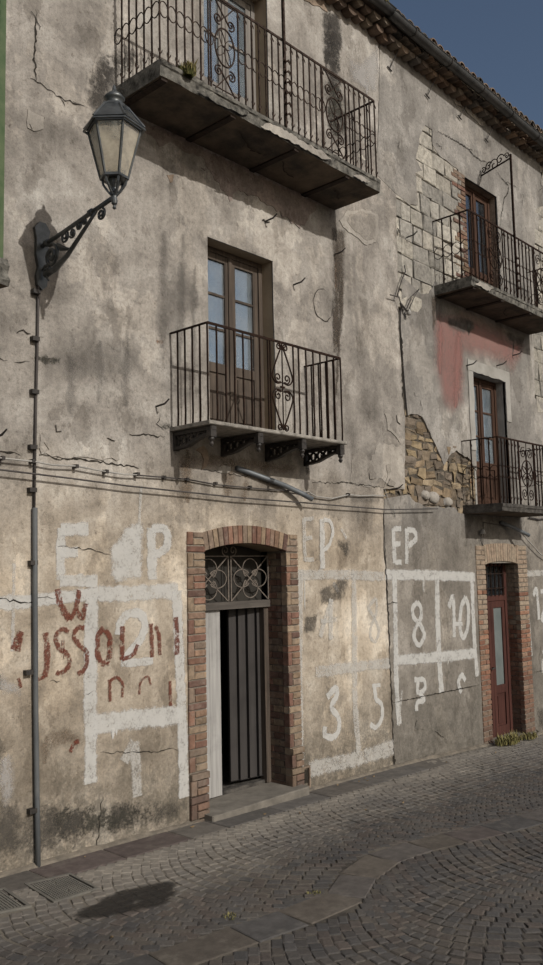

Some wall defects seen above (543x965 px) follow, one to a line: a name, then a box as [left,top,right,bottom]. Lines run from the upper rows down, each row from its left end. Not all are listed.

water stain [324,12,342,85]
spalling [350,410,476,515]